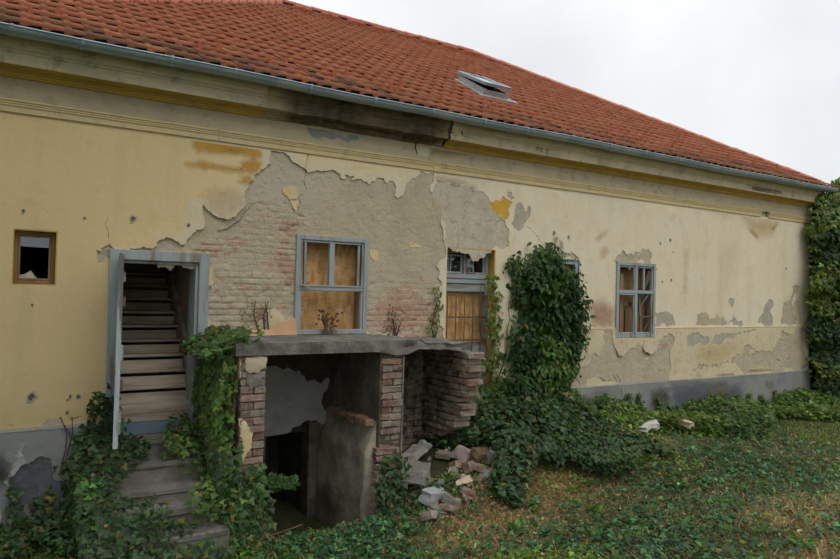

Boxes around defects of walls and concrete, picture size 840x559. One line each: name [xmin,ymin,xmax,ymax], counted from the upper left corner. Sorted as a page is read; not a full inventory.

crack [415,122,474,153]
spalling [97,245,114,262]
spalling [130,151,531,339]
spalling [614,249,652,269]
spalling [687,285,807,374]
spalling [9,456,68,518]